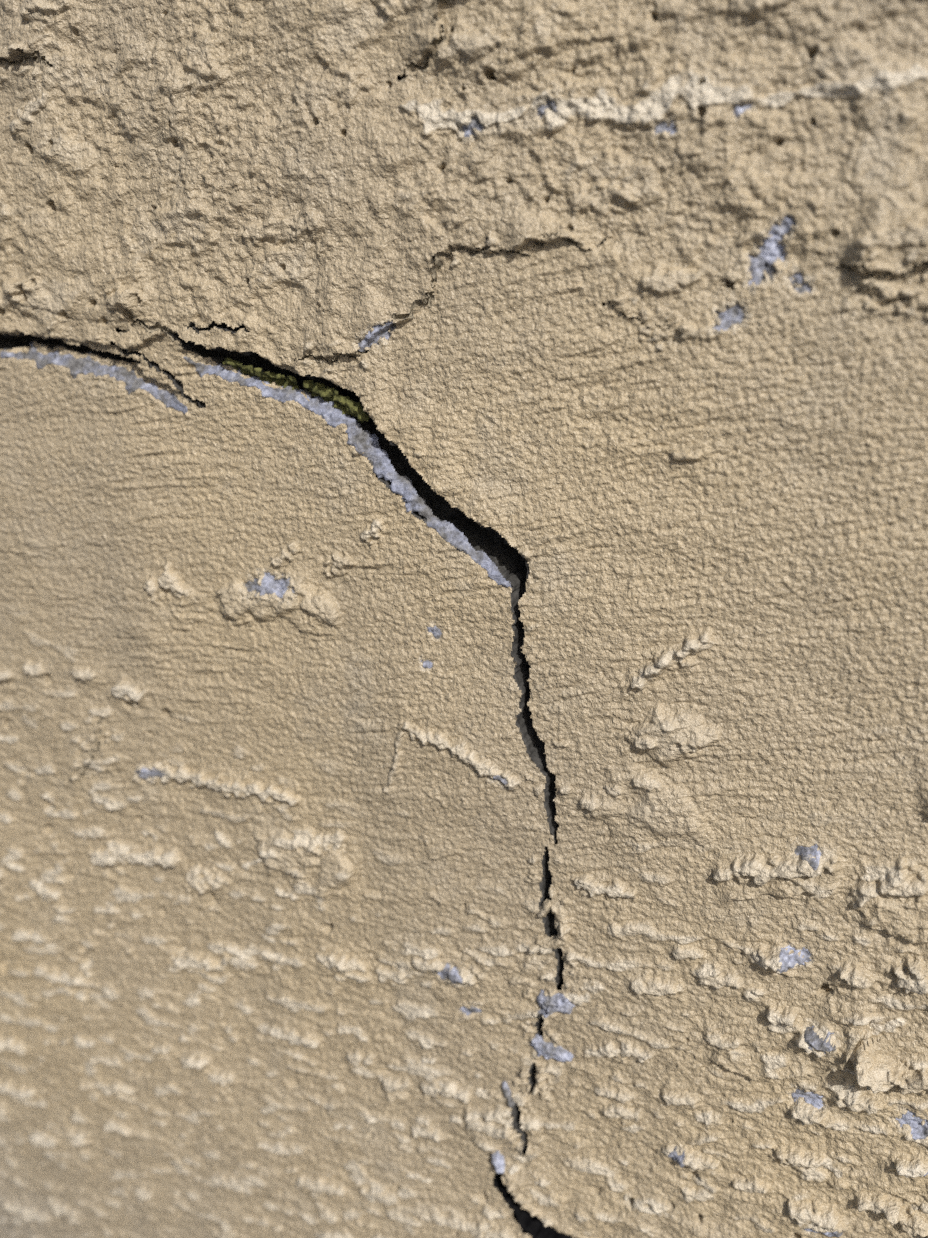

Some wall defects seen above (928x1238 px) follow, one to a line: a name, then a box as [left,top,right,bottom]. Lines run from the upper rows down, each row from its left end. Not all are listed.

crack [384,233,605,330]
crack [604,300,669,329]
crack [835,261,928,314]
crack [0,318,575,1238]